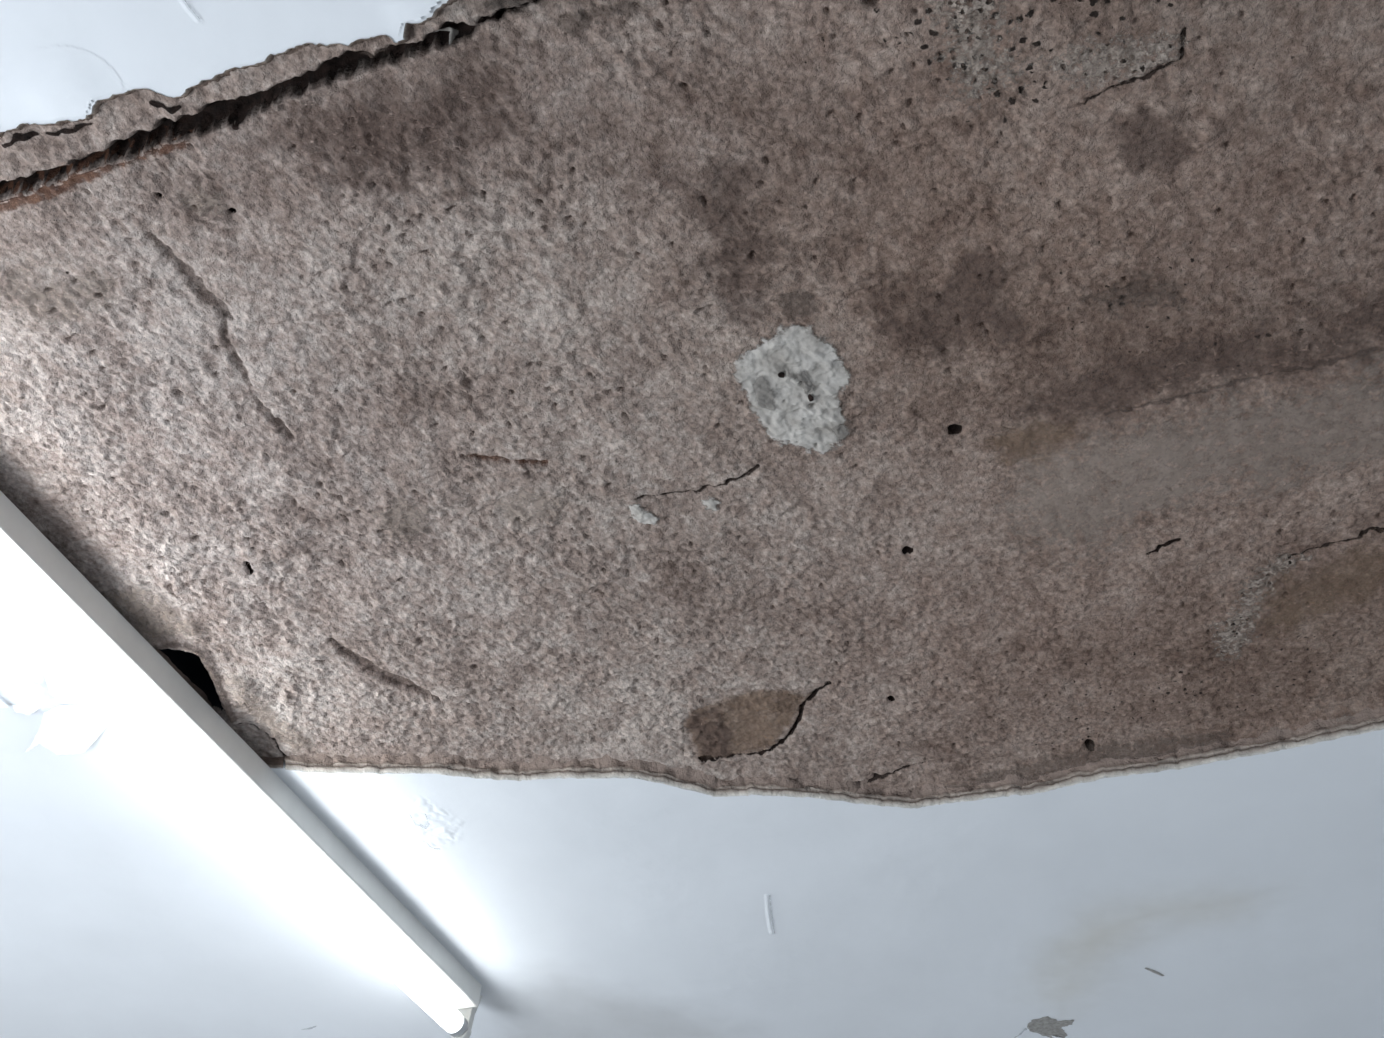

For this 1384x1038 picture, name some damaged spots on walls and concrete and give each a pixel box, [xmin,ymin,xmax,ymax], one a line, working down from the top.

crack [0,0,538,193]
crack [1084,27,1186,104]
flaking render [0,0,1384,808]
crack [698,681,831,763]
peeling [1023,1016,1074,1038]